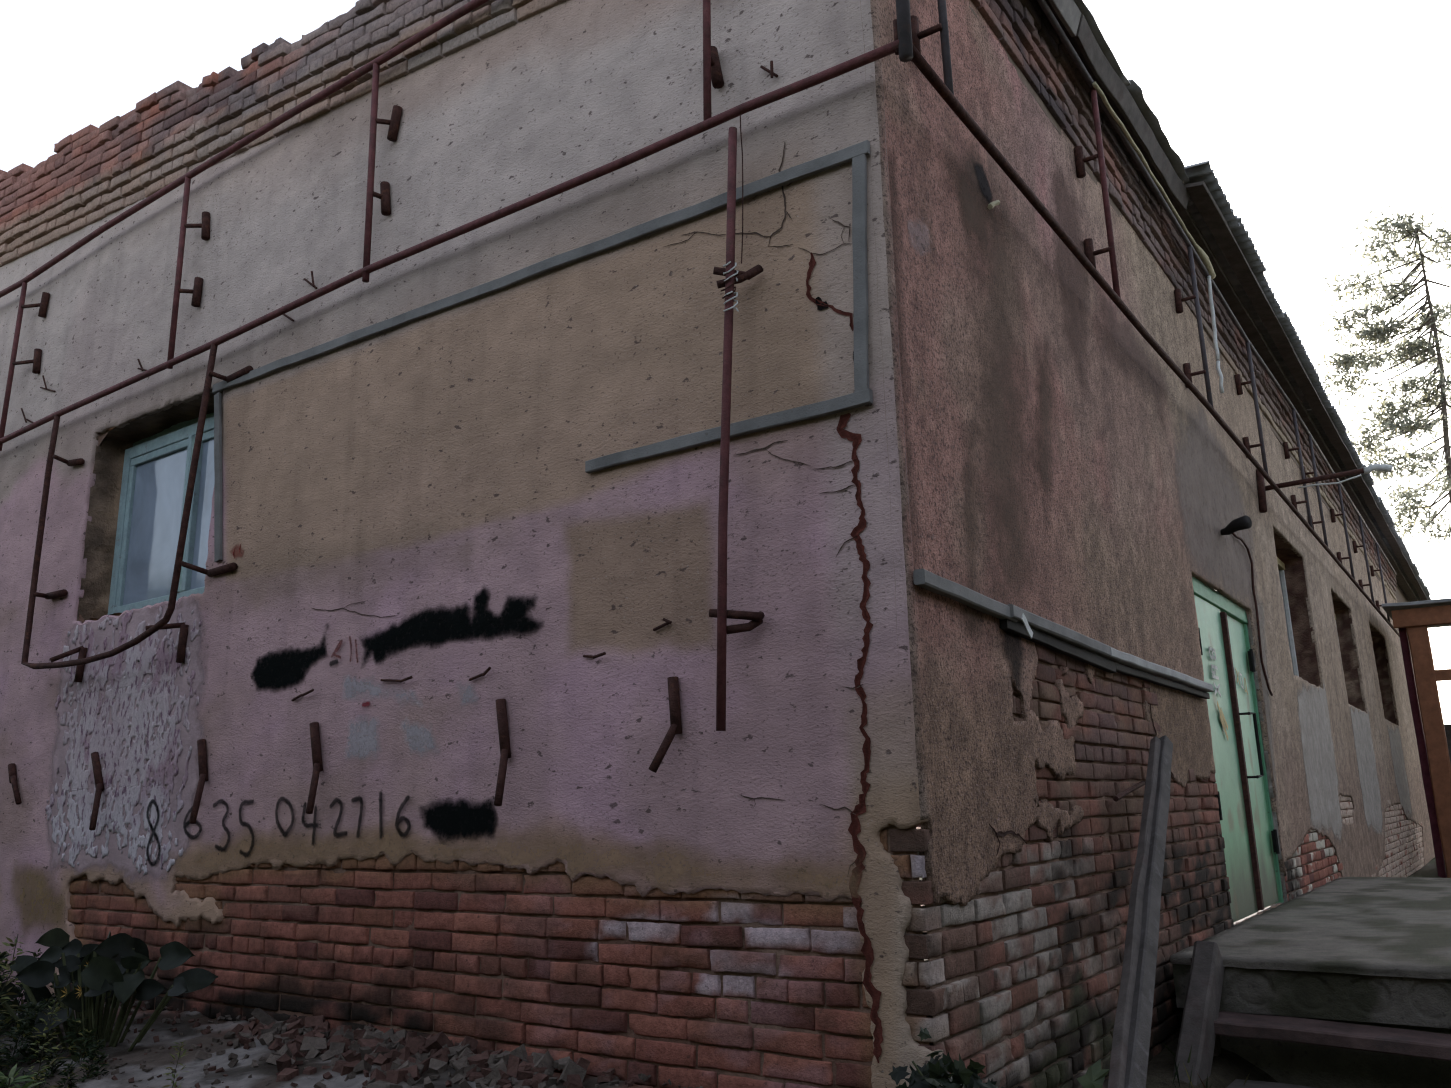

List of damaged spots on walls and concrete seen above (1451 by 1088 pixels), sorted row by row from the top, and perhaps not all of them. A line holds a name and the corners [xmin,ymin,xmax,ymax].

crack [664,142,854,361]
flaking render [45,598,874,1088]
crack [736,413,883,1063]
flaking render [879,643,1161,1088]
flaking render [1148,769,1234,1062]
flaking render [1283,830,1343,901]
flaking render [1371,800,1424,877]